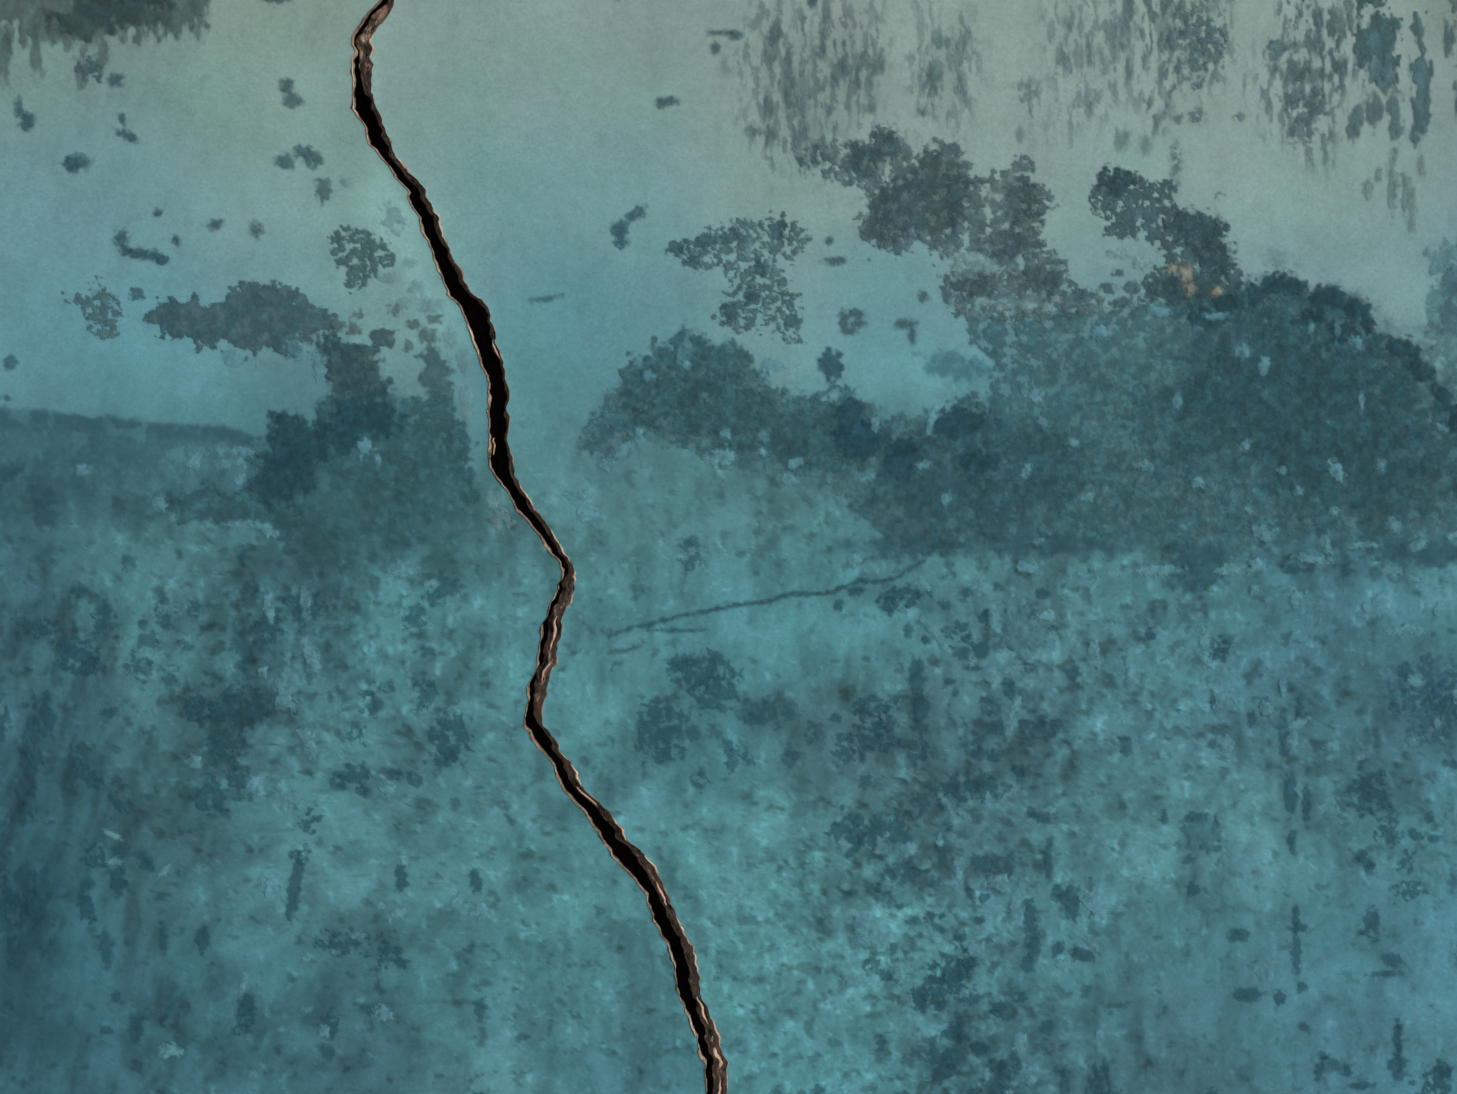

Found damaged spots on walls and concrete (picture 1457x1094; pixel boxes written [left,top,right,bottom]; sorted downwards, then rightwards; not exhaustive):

damp [712,31,742,52]
mould [1167,0,1226,90]
mould [281,80,302,108]
damp [658,96,676,108]
mould [277,145,329,200]
damp [578,106,1457,591]
damp [0,225,479,551]
crack [350,0,729,1094]
crack [630,561,924,629]
damp [286,851,307,920]